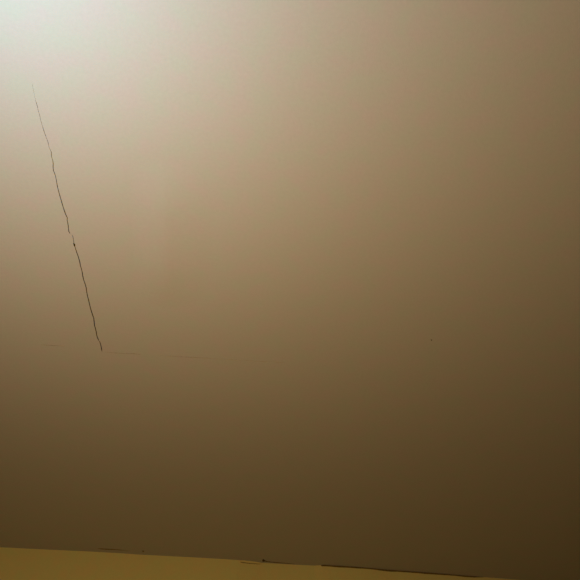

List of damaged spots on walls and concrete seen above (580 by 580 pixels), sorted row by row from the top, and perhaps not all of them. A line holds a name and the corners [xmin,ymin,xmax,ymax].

crack [32,85,102,350]